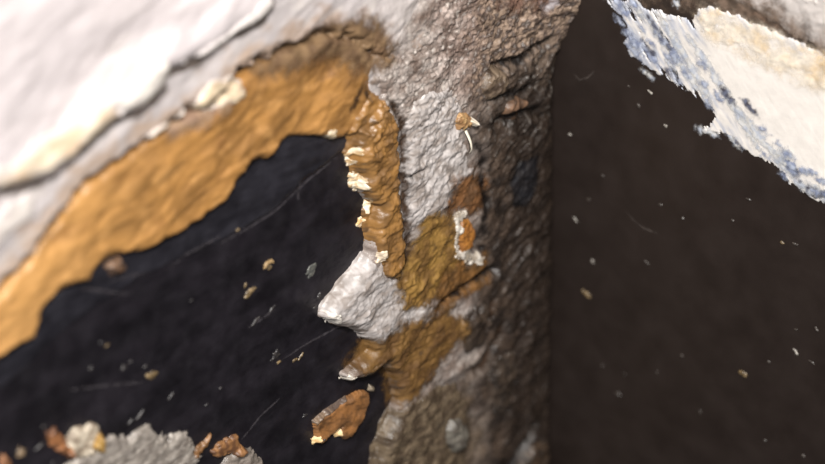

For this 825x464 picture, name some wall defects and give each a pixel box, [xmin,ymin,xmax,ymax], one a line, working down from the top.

crack [0,1,274,195]
damp [698,9,825,89]
peeling [0,0,581,464]
corrosion [344,168,490,405]